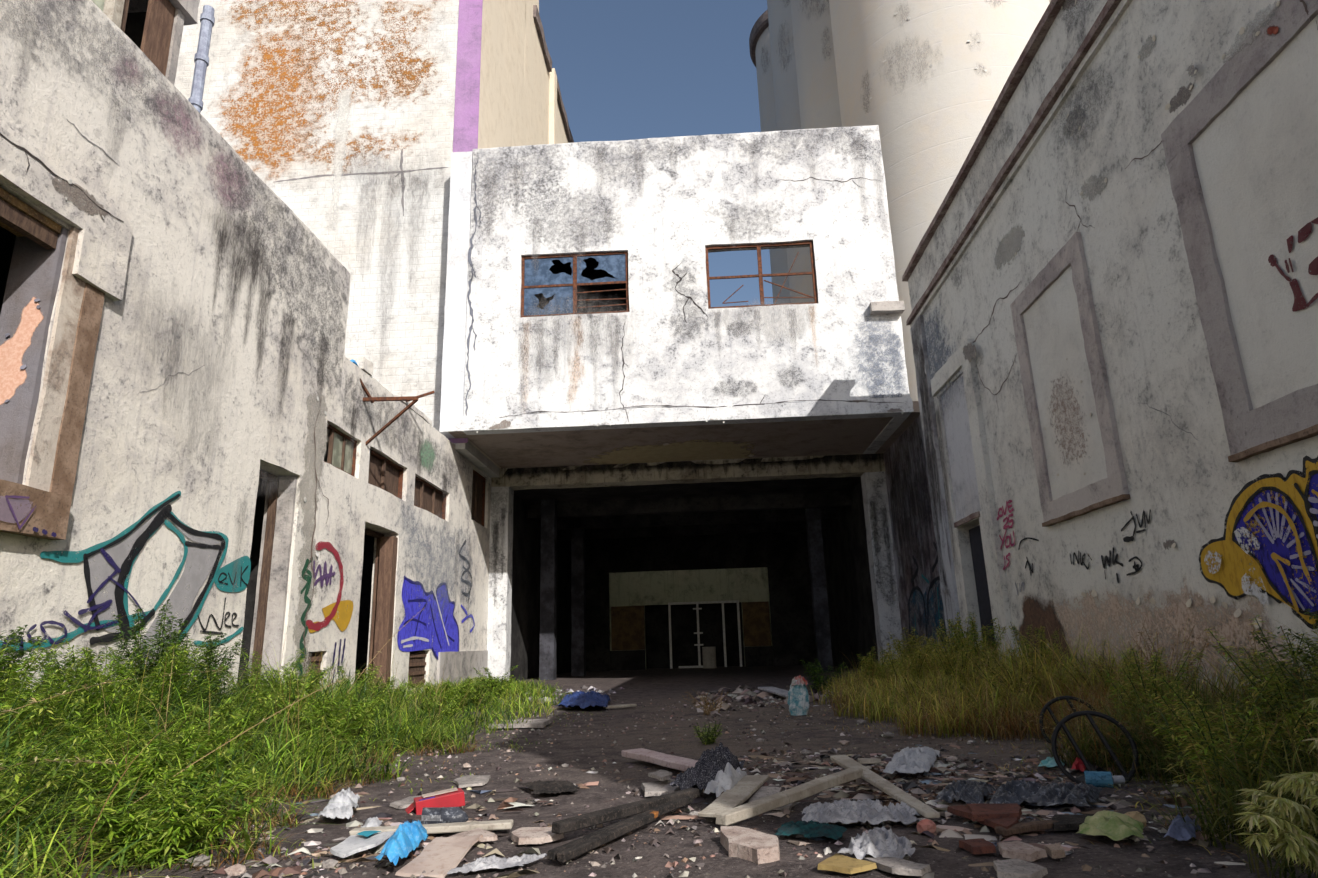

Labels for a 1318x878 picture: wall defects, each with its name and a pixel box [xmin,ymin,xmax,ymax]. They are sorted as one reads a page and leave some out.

crack [0,133,124,222]
crack [68,121,117,164]
rust [221,0,434,177]
water stain [333,90,351,219]
peeling [0,297,43,405]
water stain [214,154,458,503]
crack [275,149,481,416]
crack [672,263,708,323]
crack [499,323,901,422]
water stain [1019,596,1073,671]